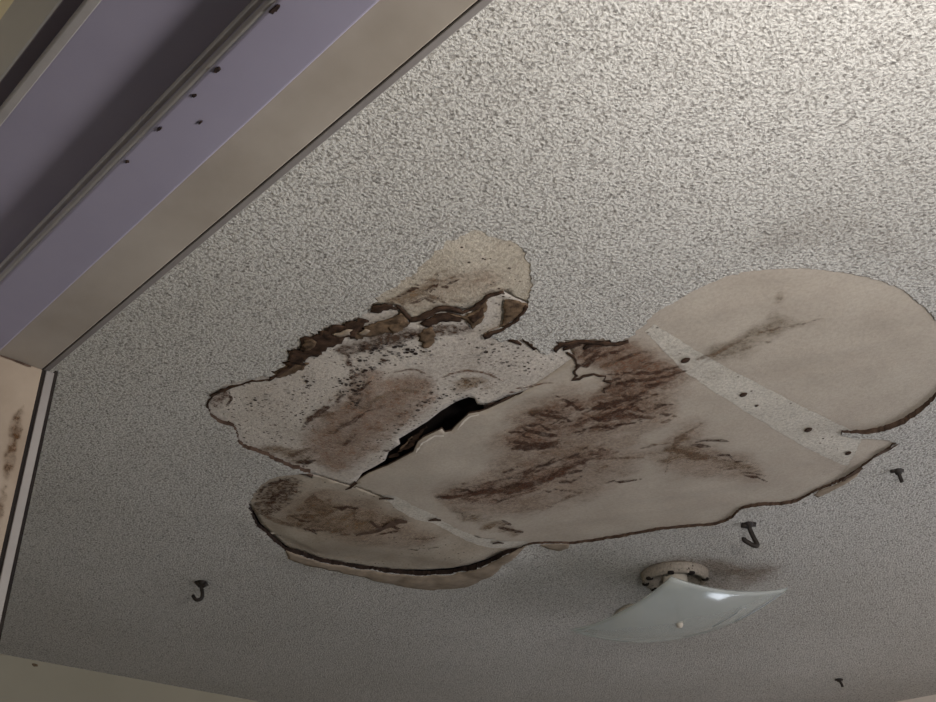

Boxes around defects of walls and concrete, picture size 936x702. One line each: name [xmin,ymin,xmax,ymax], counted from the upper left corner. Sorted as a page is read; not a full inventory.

water stain [392,272,458,304]
water stain [709,320,785,358]
water stain [264,325,527,471]
crack [345,392,523,490]
water stain [439,340,685,535]
peeling [206,230,936,551]
water stain [648,432,767,482]
water stain [255,477,401,542]